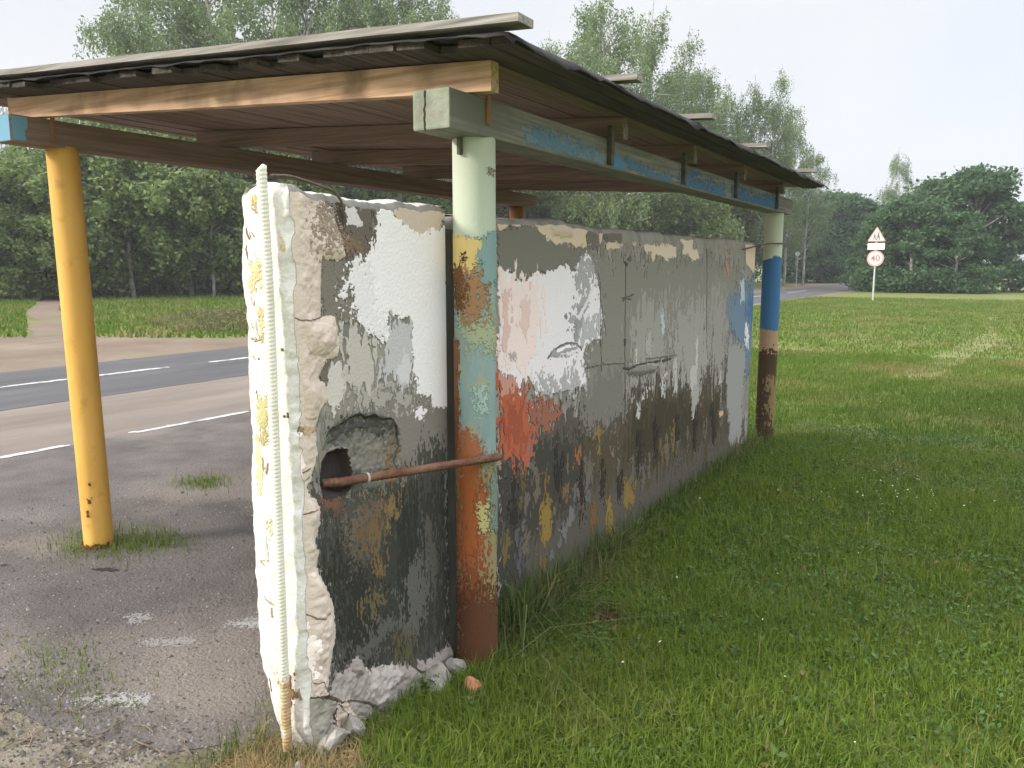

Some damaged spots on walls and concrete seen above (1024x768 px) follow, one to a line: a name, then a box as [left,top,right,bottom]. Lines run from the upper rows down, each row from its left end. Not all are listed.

rust [317,251,513,671]
peeling [320,137,699,500]
water stain [299,225,750,692]
peeling [521,124,784,387]
rust [755,328,778,440]
peeling [306,622,323,680]
spalling [292,688,366,746]
peeling [350,661,404,706]